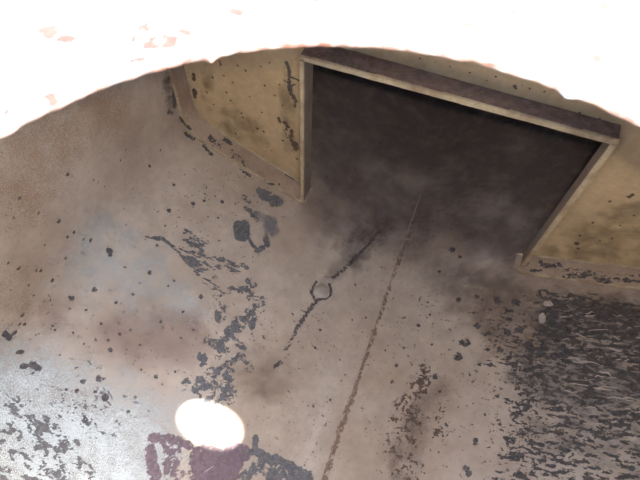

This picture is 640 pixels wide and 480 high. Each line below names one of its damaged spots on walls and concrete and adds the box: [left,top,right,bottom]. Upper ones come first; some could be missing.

peeling [233,194,271,253]
peeling [256,187,284,210]
peeling [2,314,26,341]
peeling [0,355,116,480]
peeling [144,229,267,411]
peeling [139,432,313,480]
crack [274,229,382,369]
peeling [441,289,640,480]